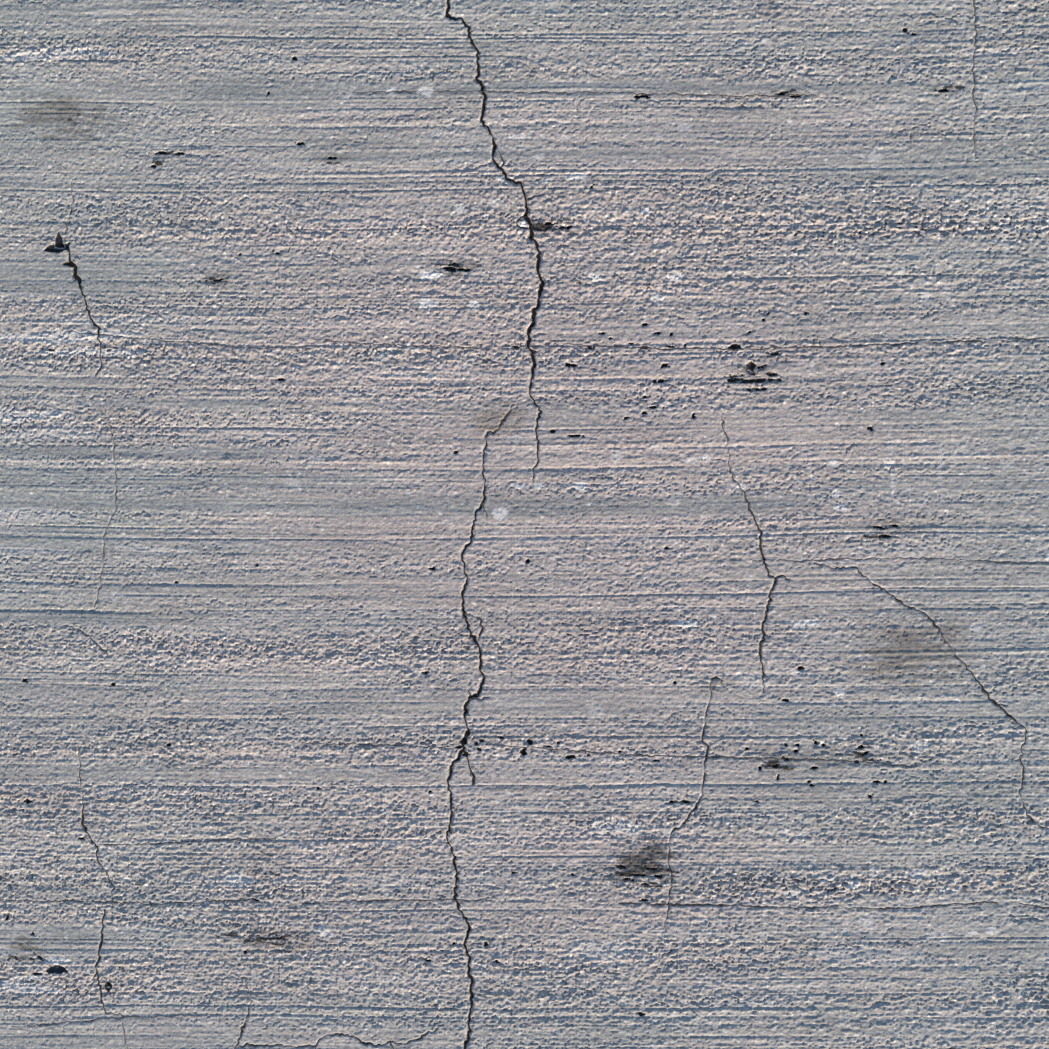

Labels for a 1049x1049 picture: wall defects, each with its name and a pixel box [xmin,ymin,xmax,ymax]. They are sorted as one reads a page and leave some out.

crack [65,181,102,376]
crack [446,0,553,1049]
crack [721,417,789,691]
crack [815,563,1048,829]
crack [234,977,437,1049]